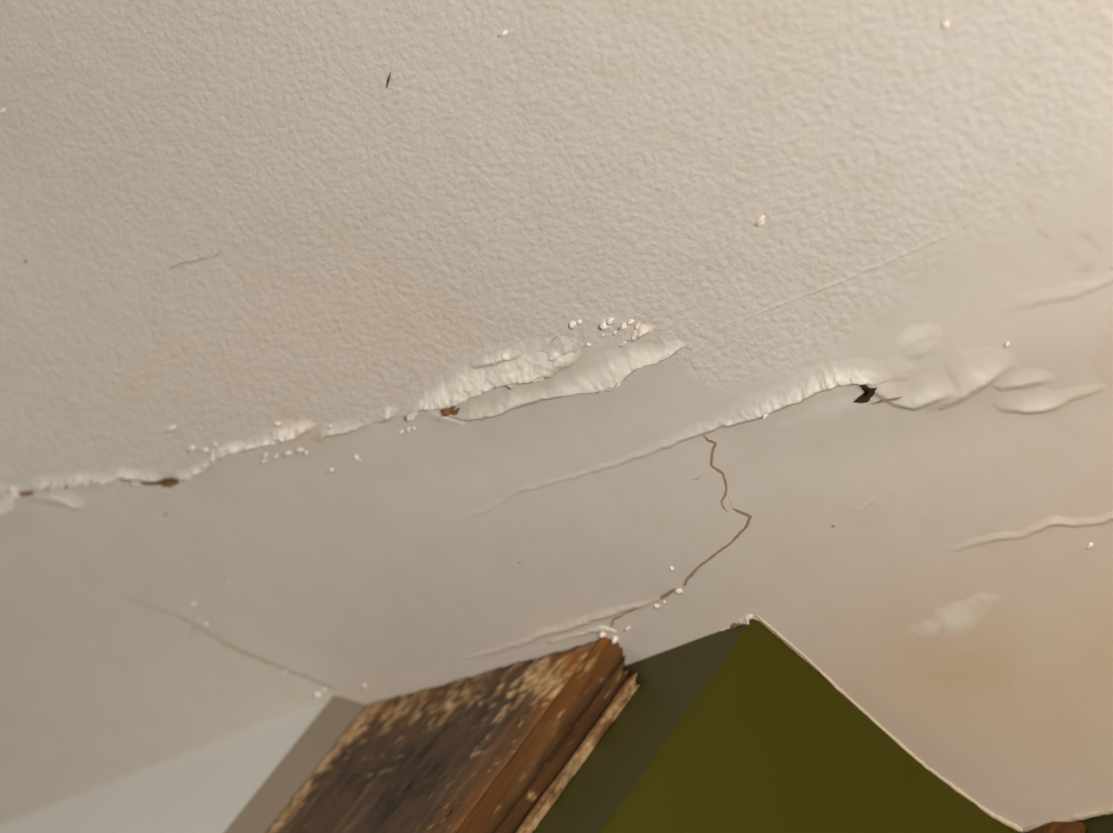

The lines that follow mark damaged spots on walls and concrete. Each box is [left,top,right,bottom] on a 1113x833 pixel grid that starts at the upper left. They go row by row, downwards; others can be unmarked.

peeling [585,318,654,347]
peeling [0,406,416,521]
crack [610,435,752,628]
peeling [455,342,1107,520]